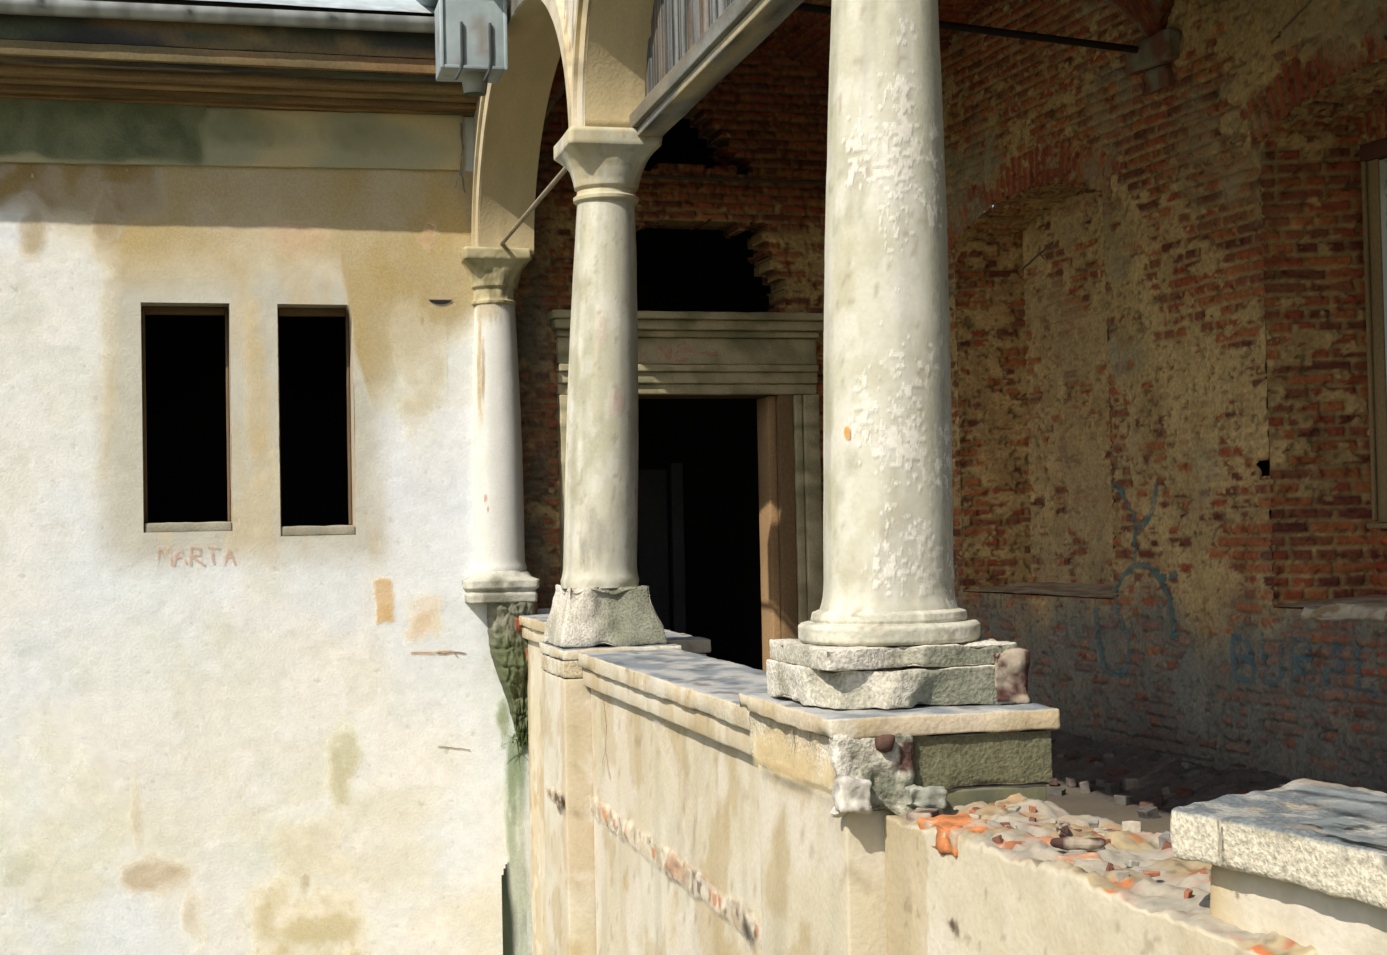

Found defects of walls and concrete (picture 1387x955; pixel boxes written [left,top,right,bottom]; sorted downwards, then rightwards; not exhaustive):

leakage [0,98,497,416]
peeling [842,0,958,609]
peeling [374,578,394,624]
peeling [410,613,452,654]
spalling [1301,604,1387,620]
leakage [496,701,508,747]
spalling [829,733,948,818]